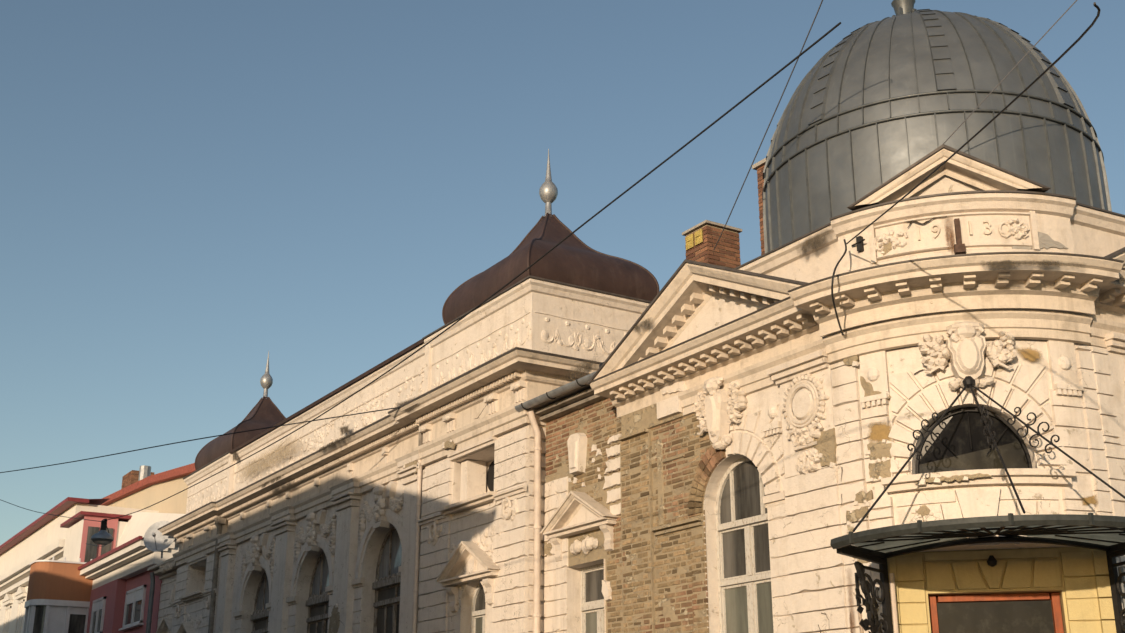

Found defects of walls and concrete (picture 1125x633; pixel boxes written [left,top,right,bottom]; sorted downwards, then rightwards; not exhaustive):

spalling [660,380,687,395]
spalling [542,540,552,557]
spalling [545,398,726,633]
spalling [846,439,892,535]